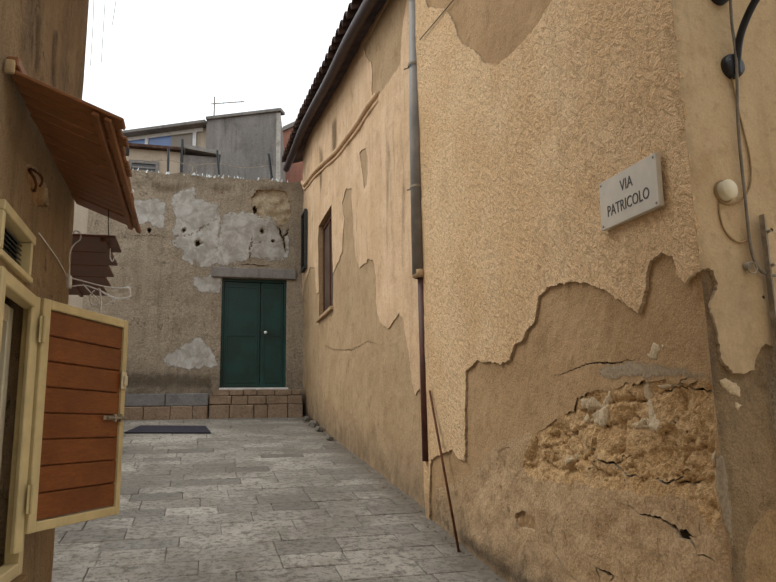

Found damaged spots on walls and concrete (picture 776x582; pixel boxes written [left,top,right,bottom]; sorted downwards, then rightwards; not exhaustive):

peeling [364,0,407,95]
peeling [425,0,552,65]
peeling [359,148,368,188]
peeling [134,187,291,293]
peeling [163,337,218,369]
peeling [303,188,776,582]
crack [552,359,636,376]
crack [580,437,704,486]
crack [624,504,704,556]